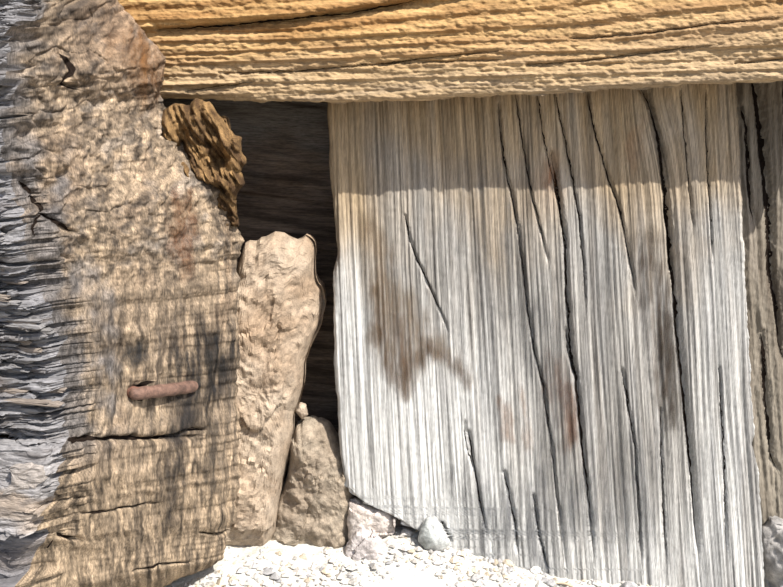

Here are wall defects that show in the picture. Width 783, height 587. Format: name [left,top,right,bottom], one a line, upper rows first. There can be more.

crack [159,0,414,30]
crack [488,18,776,65]
crack [587,93,639,303]
peeling [0,294,56,372]
crack [498,94,594,576]
crack [641,90,700,578]
crack [741,83,783,479]
spalling [3,462,48,495]
peeling [0,387,67,414]
crack [0,429,208,444]
crack [464,425,488,544]
crack [622,368,644,573]